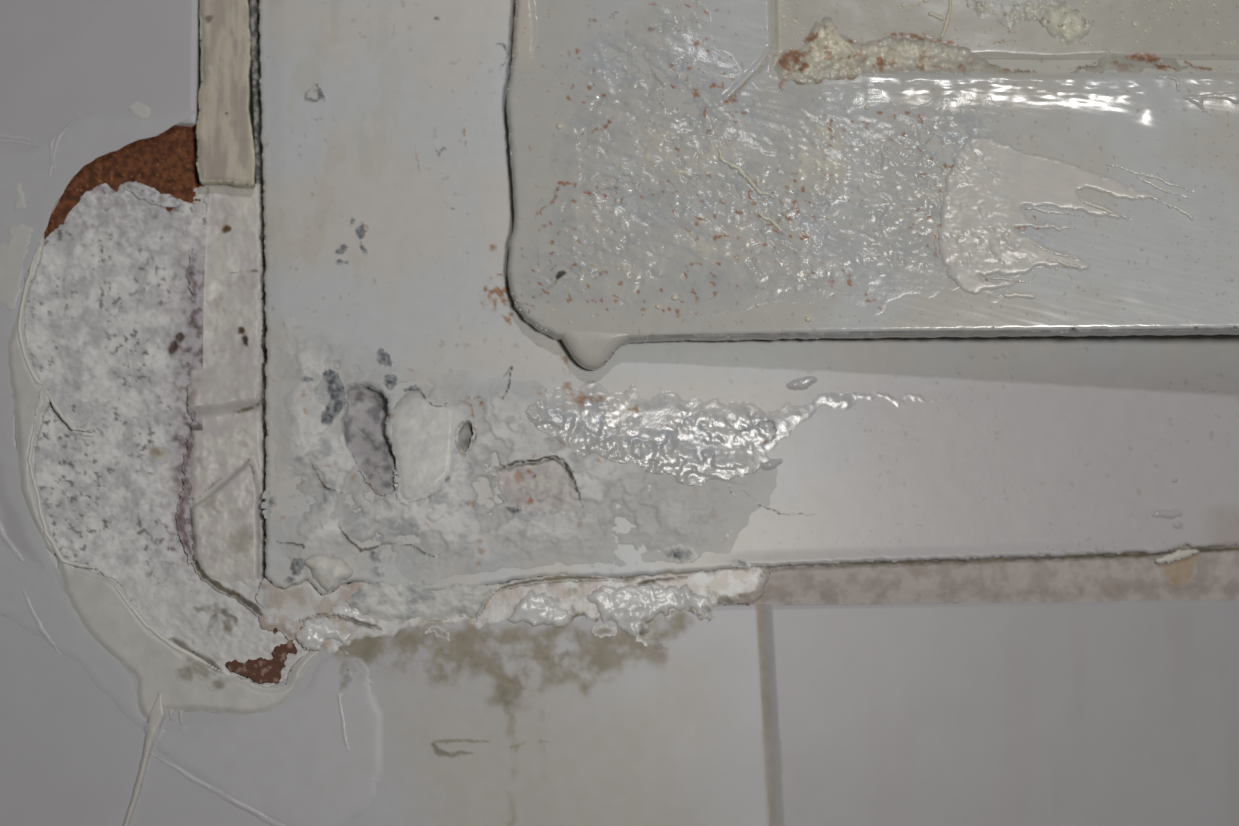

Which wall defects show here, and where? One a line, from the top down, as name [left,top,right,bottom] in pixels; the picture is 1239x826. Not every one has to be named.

peeling [335,216,369,265]
corrosion [477,273,516,327]
spalling [8,113,322,721]
peeling [303,368,348,426]
peeling [376,347,456,500]
peeling [731,419,777,443]
crack [485,455,585,509]
peeling [661,544,697,565]
crack [771,546,1239,571]
leakage [331,604,789,826]